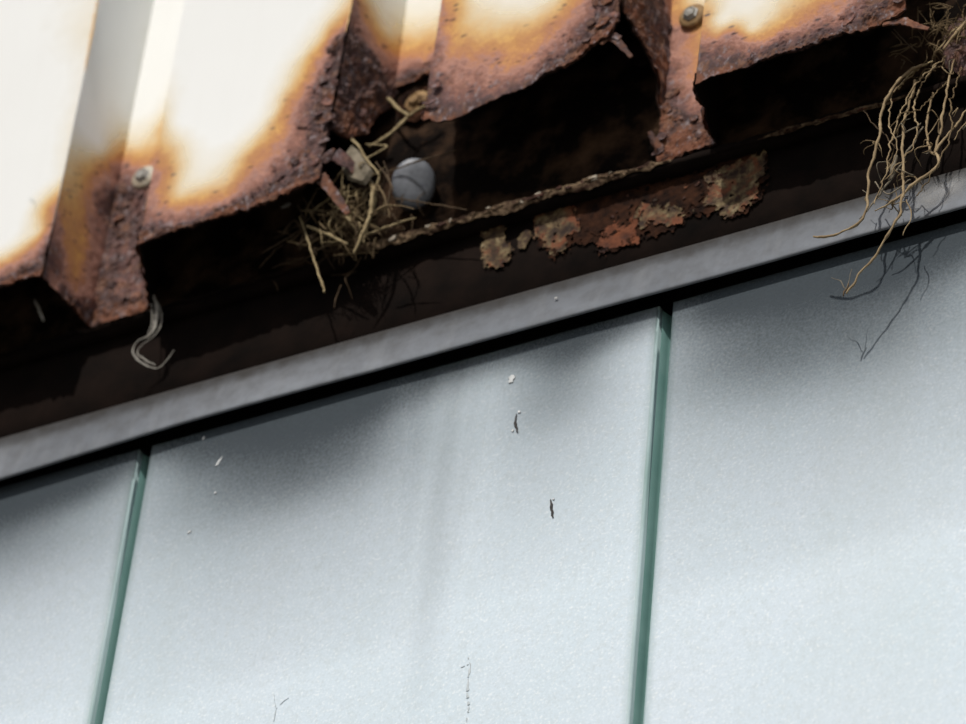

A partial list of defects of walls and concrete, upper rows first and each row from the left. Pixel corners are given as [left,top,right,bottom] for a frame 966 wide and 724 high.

rust [940,17,966,77]
rust [0,0,930,355]
peeling [480,149,770,269]